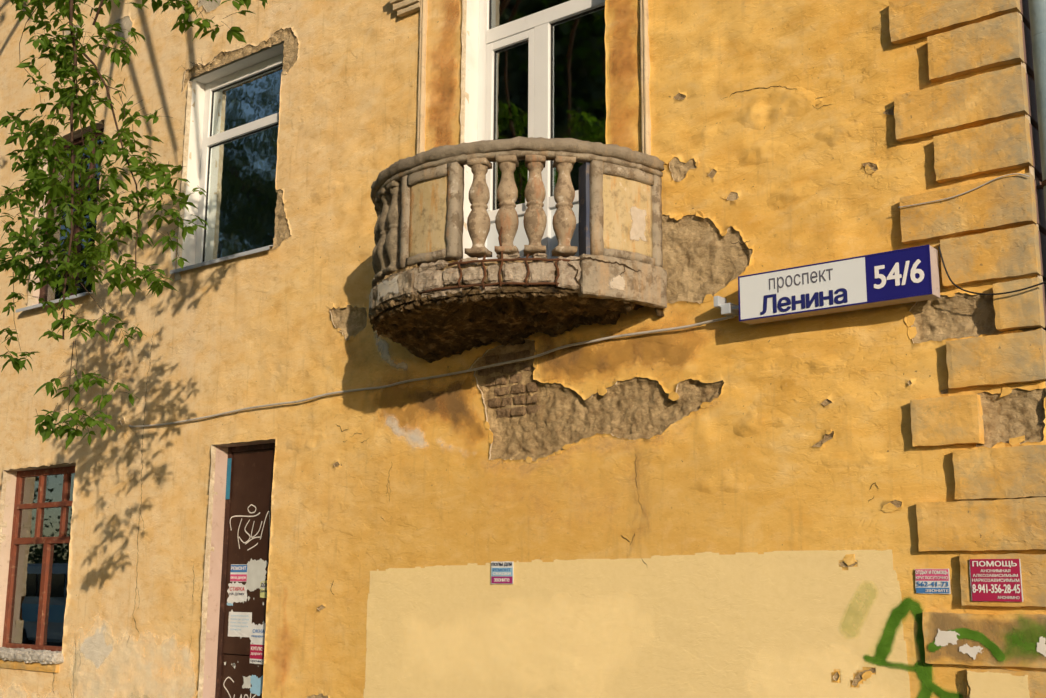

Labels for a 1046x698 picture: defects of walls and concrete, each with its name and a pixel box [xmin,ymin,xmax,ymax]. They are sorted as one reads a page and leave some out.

spalling [183,28,299,89]
spalling [271,190,291,250]
peeling [630,207,646,241]
spalling [662,210,753,304]
spalling [326,302,367,340]
spalling [904,293,1042,343]
leakage [377,340,484,447]
spalling [471,340,724,463]
spalling [977,387,1046,448]